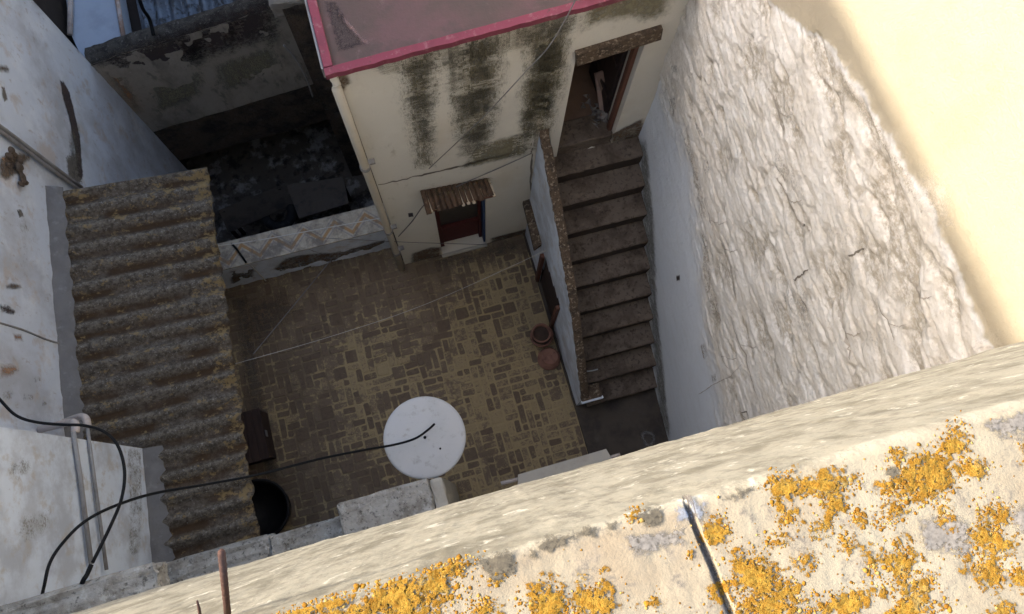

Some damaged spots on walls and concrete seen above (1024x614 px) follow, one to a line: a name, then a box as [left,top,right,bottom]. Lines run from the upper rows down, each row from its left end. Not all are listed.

spalling [0,154,30,178]
water stain [60,81,83,183]
water stain [379,0,665,167]
crack [682,495,728,614]